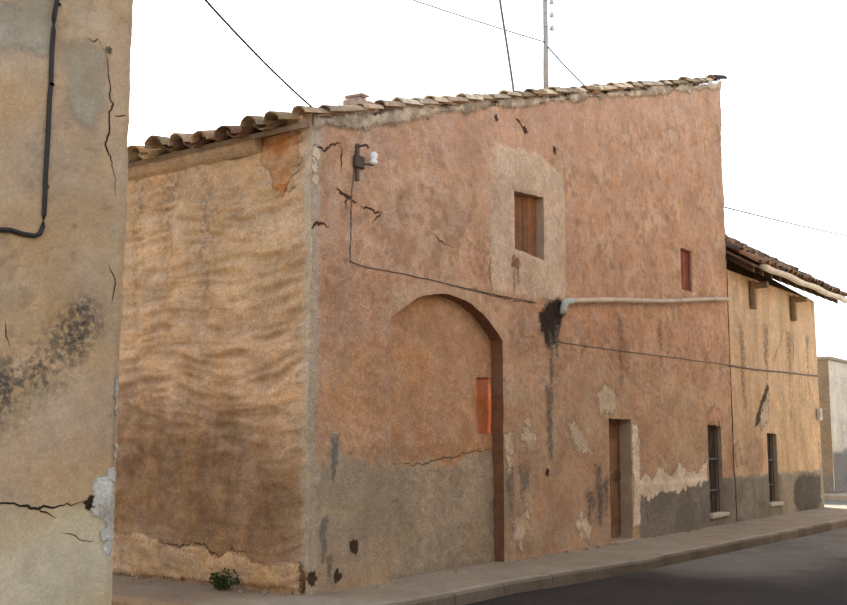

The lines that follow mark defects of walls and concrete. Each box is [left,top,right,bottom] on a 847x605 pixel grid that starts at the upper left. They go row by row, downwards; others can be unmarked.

crack [90,38,125,196]
spalling [261,130,302,196]
peeling [311,146,320,186]
peeling [596,385,616,416]
crack [391,449,491,466]
peeling [632,424,708,528]
leakage [794,474,822,511]
crack [0,501,94,542]
peeling [90,436,306,595]